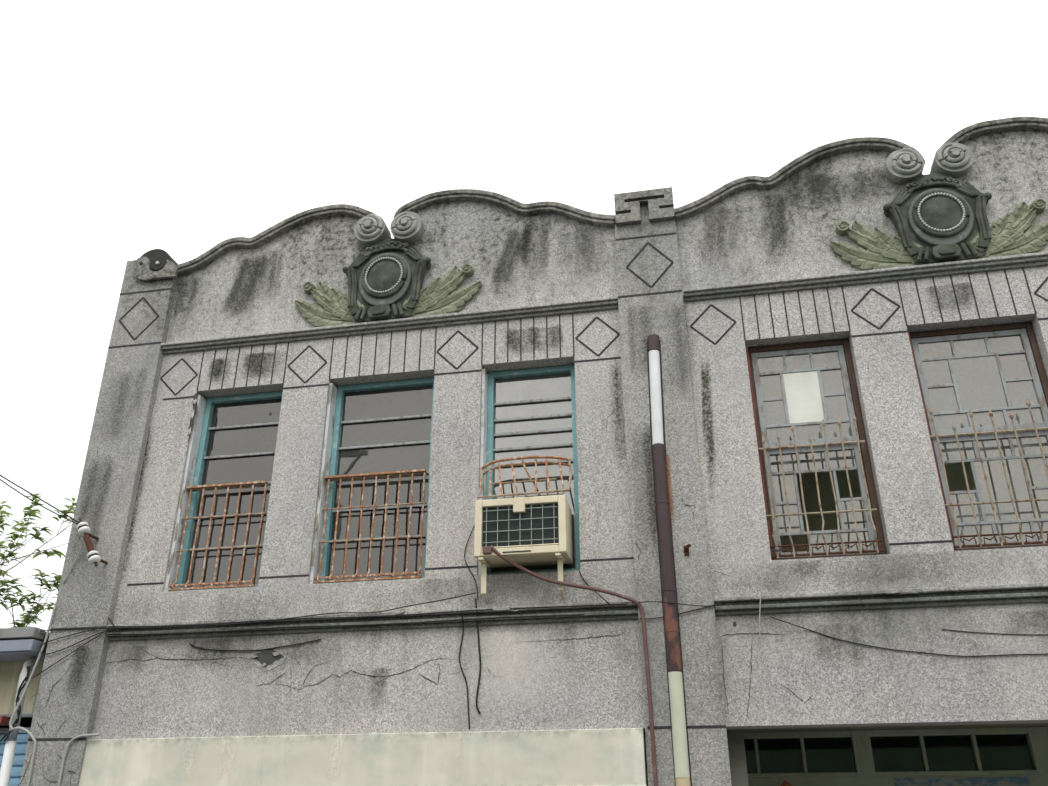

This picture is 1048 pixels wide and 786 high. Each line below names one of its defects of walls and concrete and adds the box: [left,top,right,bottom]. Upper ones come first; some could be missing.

crack [500,634,632,643]
crack [258,658,524,692]